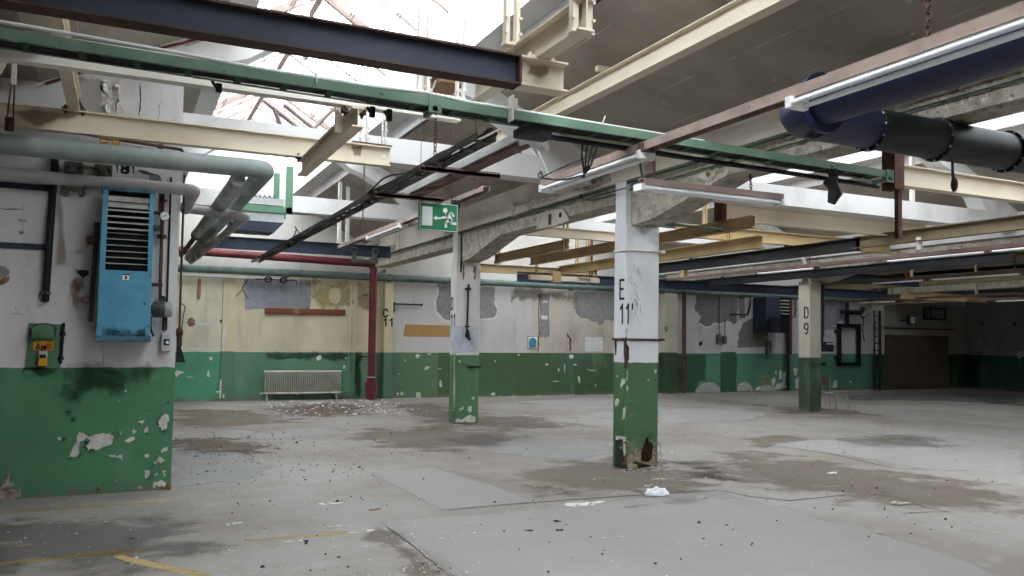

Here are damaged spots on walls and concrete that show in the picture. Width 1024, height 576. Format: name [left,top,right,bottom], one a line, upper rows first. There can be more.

flaking render [78,77,126,116]
corrosion [614,329,629,368]
peeling [404,353,475,422]
peeling [615,371,628,420]
peeling [695,382,721,393]
peeling [57,401,170,468]
peeling [137,447,168,491]
peeling [615,436,655,469]
corrosion [632,437,653,468]